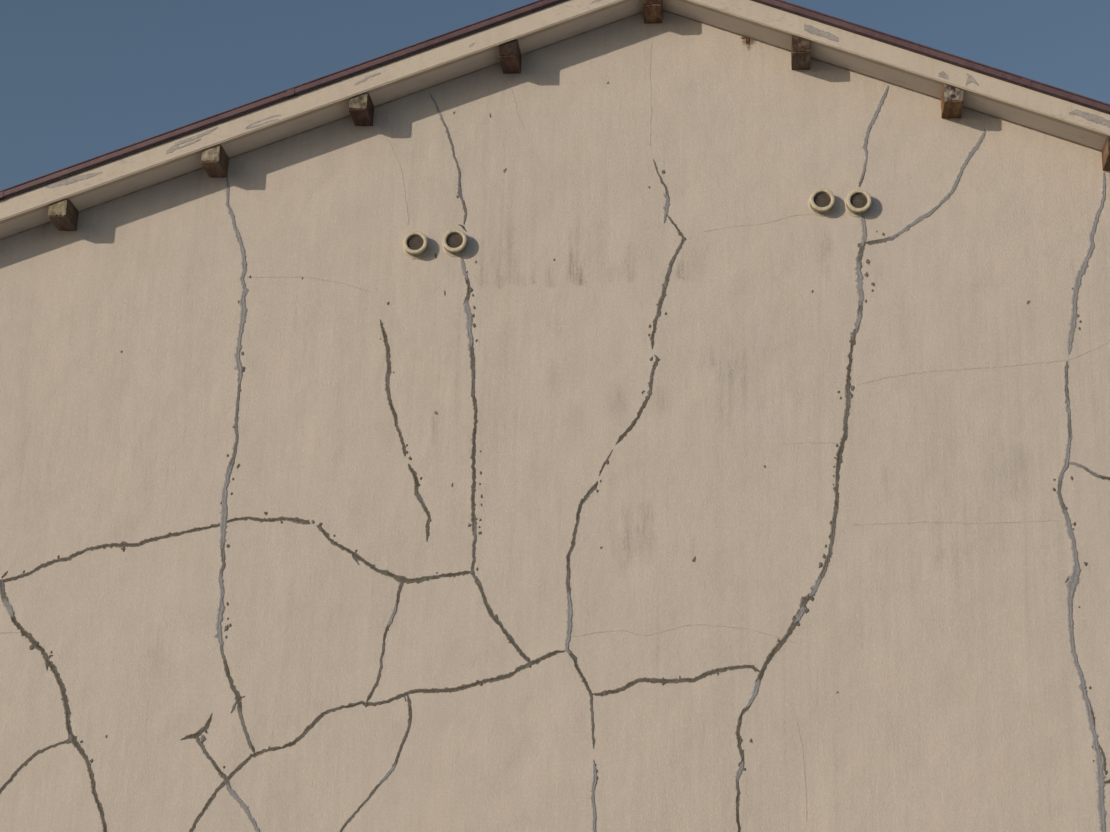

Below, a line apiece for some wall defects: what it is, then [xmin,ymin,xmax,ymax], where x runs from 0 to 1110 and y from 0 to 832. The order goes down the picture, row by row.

crack [429,92,467,232]
crack [0,124,985,832]
crack [859,86,889,187]
crack [854,172,1110,832]